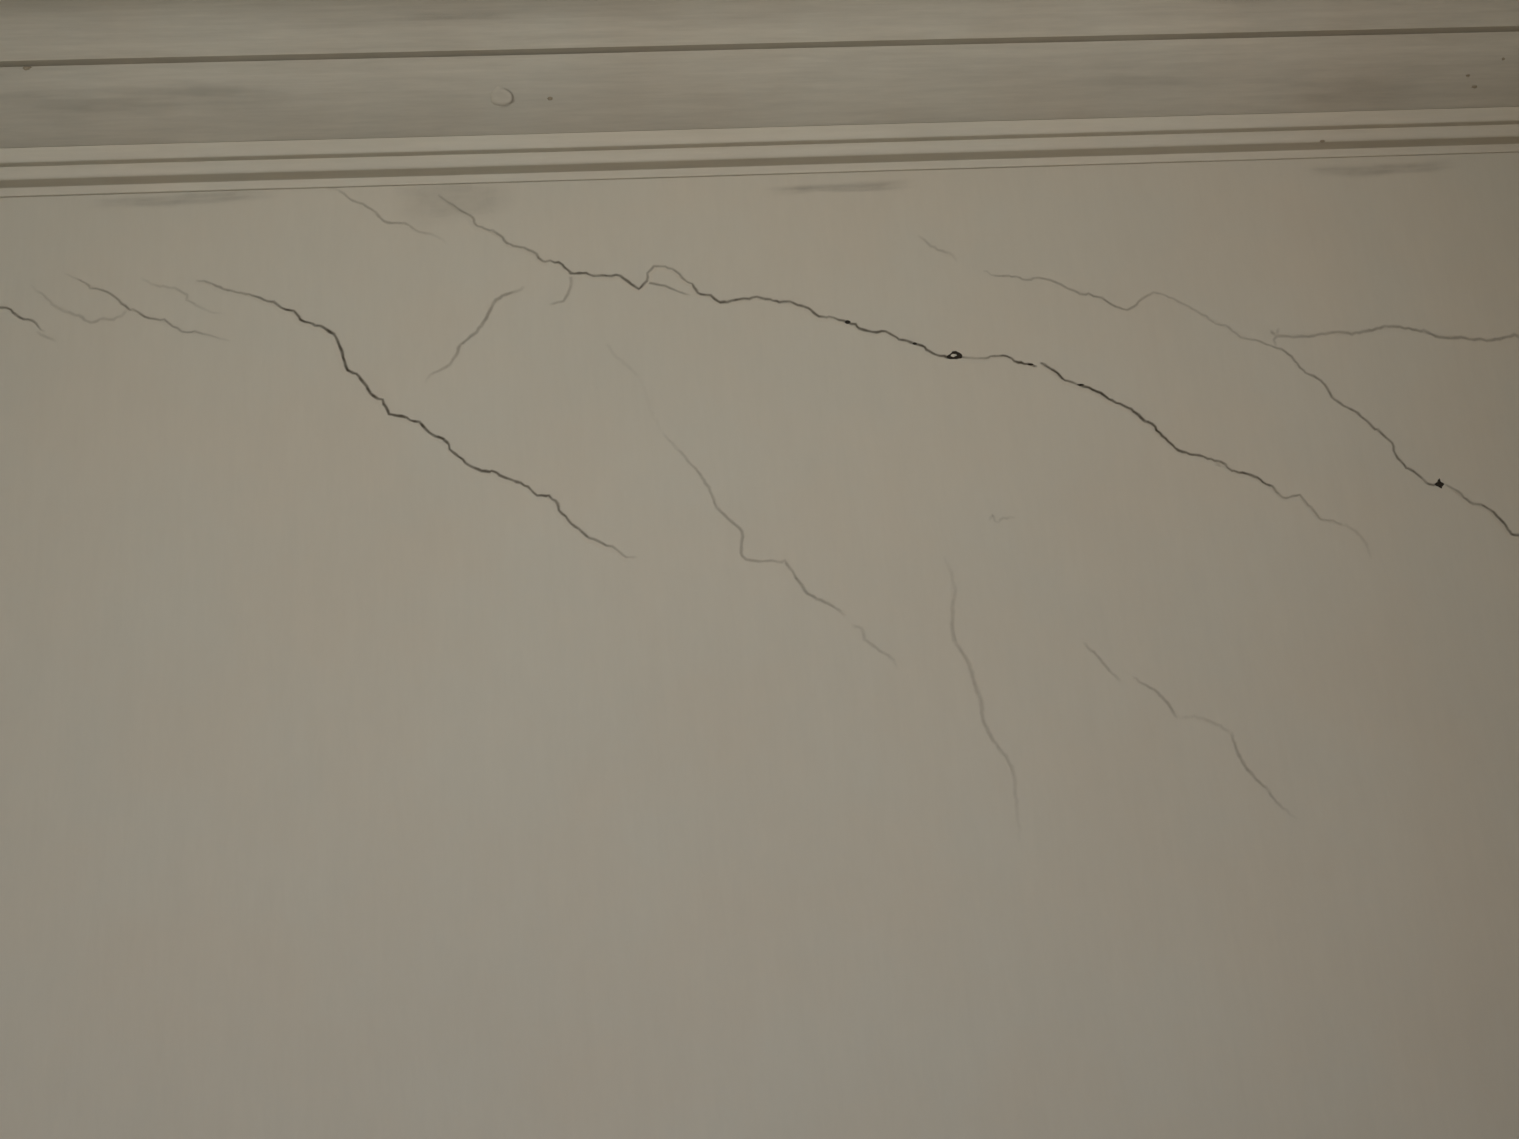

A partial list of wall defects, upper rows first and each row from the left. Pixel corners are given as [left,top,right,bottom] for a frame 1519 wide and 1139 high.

crack [194,282,637,563]
crack [435,196,1343,528]
crack [1435,478,1519,542]